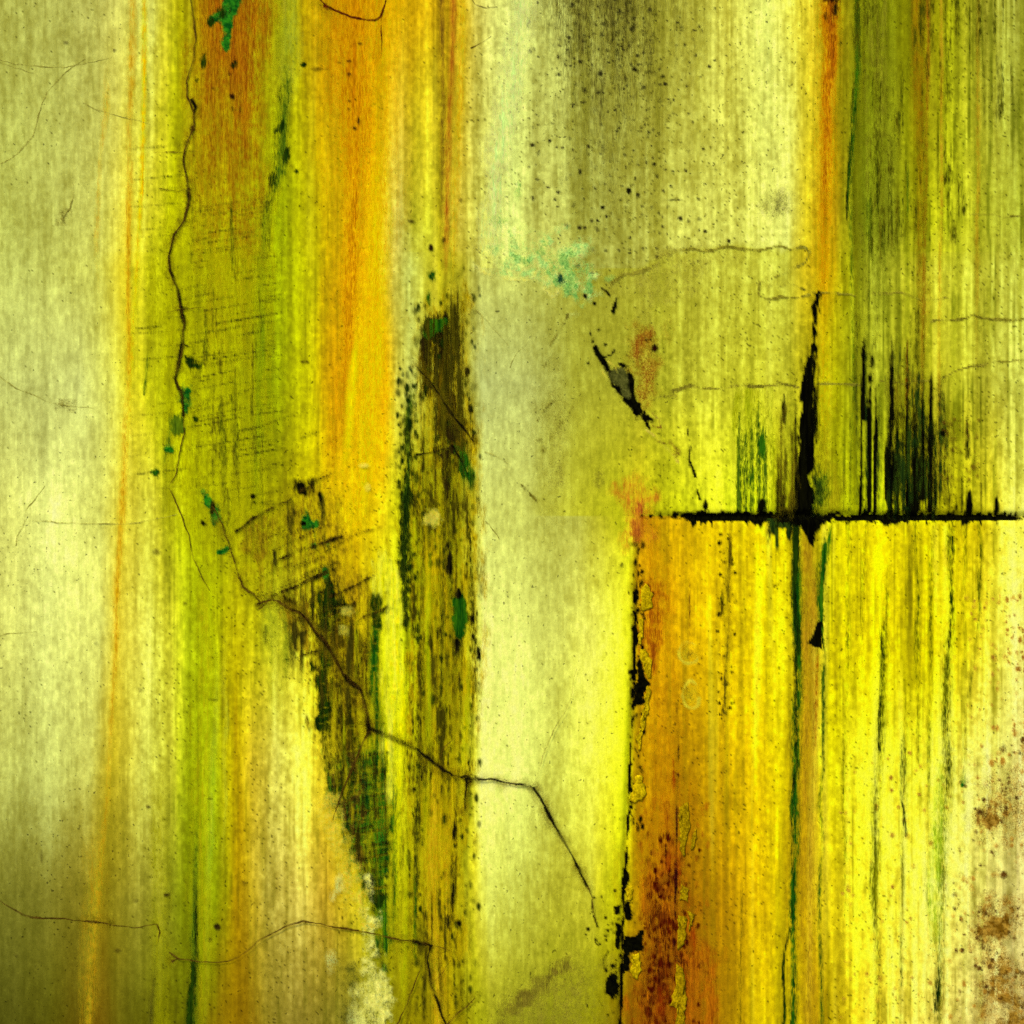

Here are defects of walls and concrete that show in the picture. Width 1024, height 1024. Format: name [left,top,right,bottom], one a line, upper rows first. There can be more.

crack [0,58,109,163]
crack [27,0,210,591]
damp [611,245,809,297]
spalling [587,329,664,444]
crack [641,498,1024,549]
damp [310,293,477,1024]
rust [642,583,666,672]
damp [660,275,1024,1024]
crack [213,507,653,1024]
crack [2,902,475,1024]
rust [623,833,719,1024]